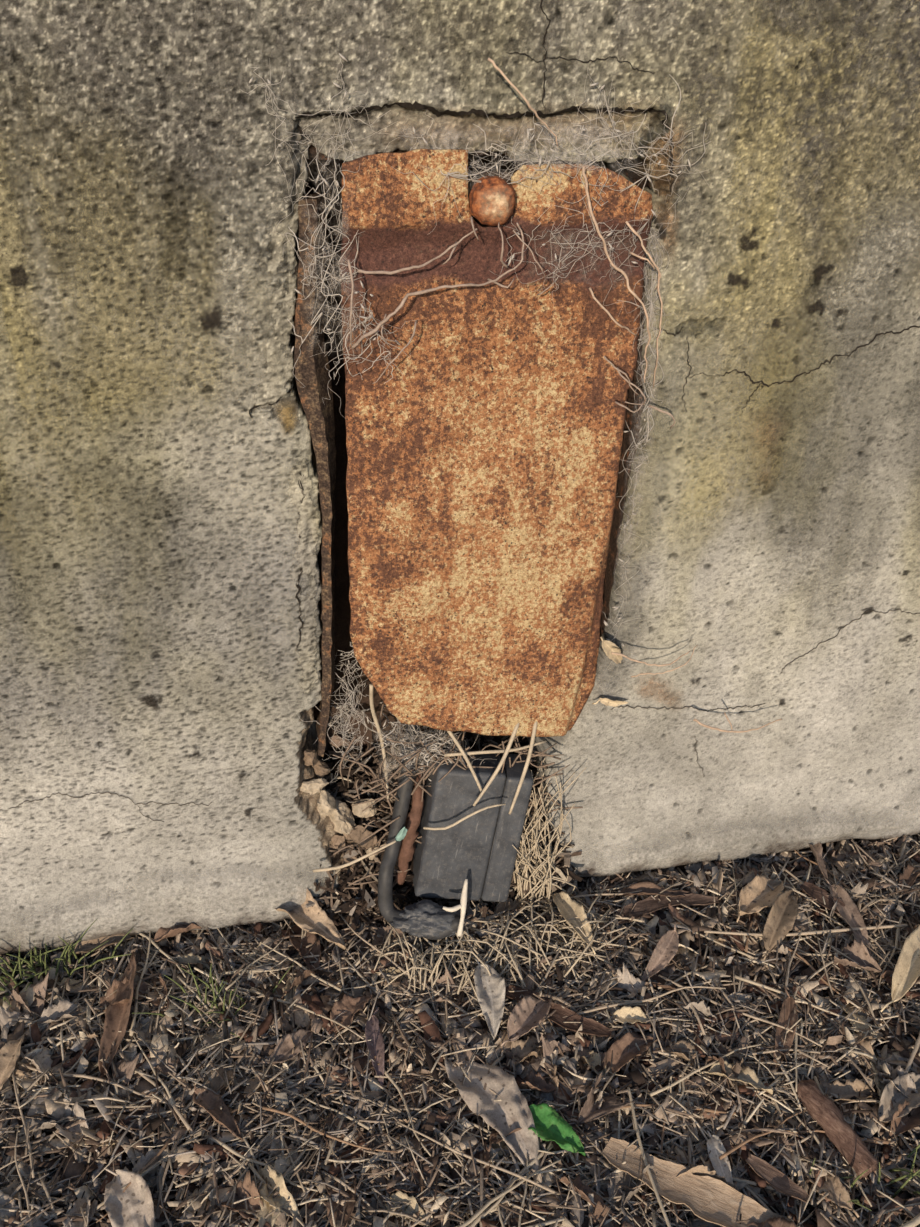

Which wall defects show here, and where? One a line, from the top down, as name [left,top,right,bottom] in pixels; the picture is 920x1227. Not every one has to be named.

crack [291,0,675,192]
crack [651,326,920,413]
crack [781,608,920,673]